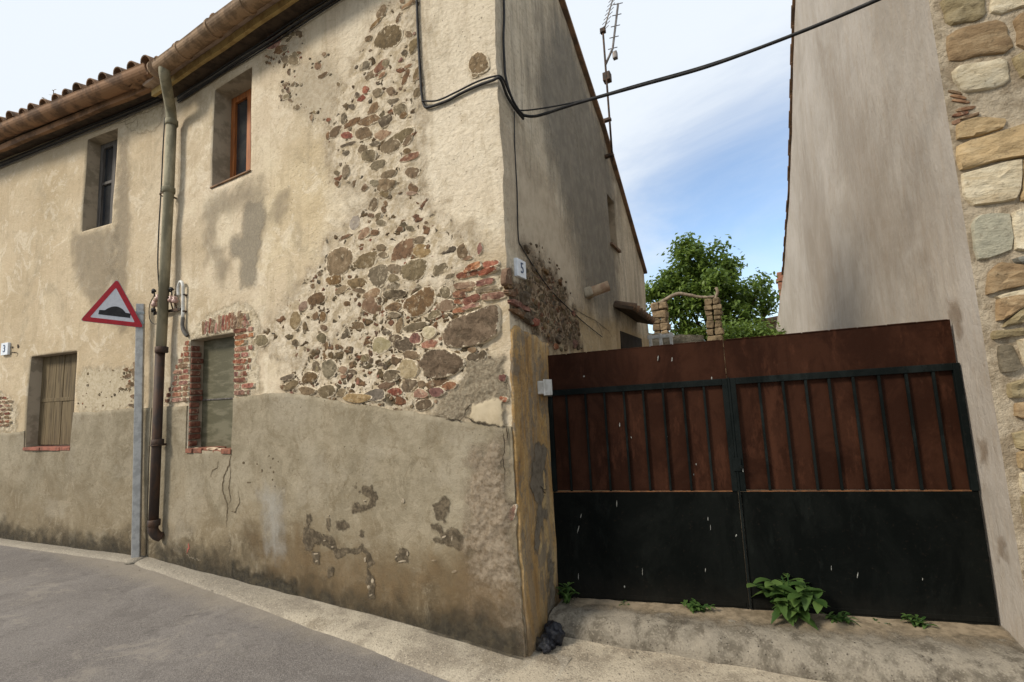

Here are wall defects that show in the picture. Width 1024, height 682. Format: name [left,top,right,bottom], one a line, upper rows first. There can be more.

flaking render [163,0,584,413]
crack [210,455,240,527]
peeling [303,485,378,600]
peeling [430,496,464,551]